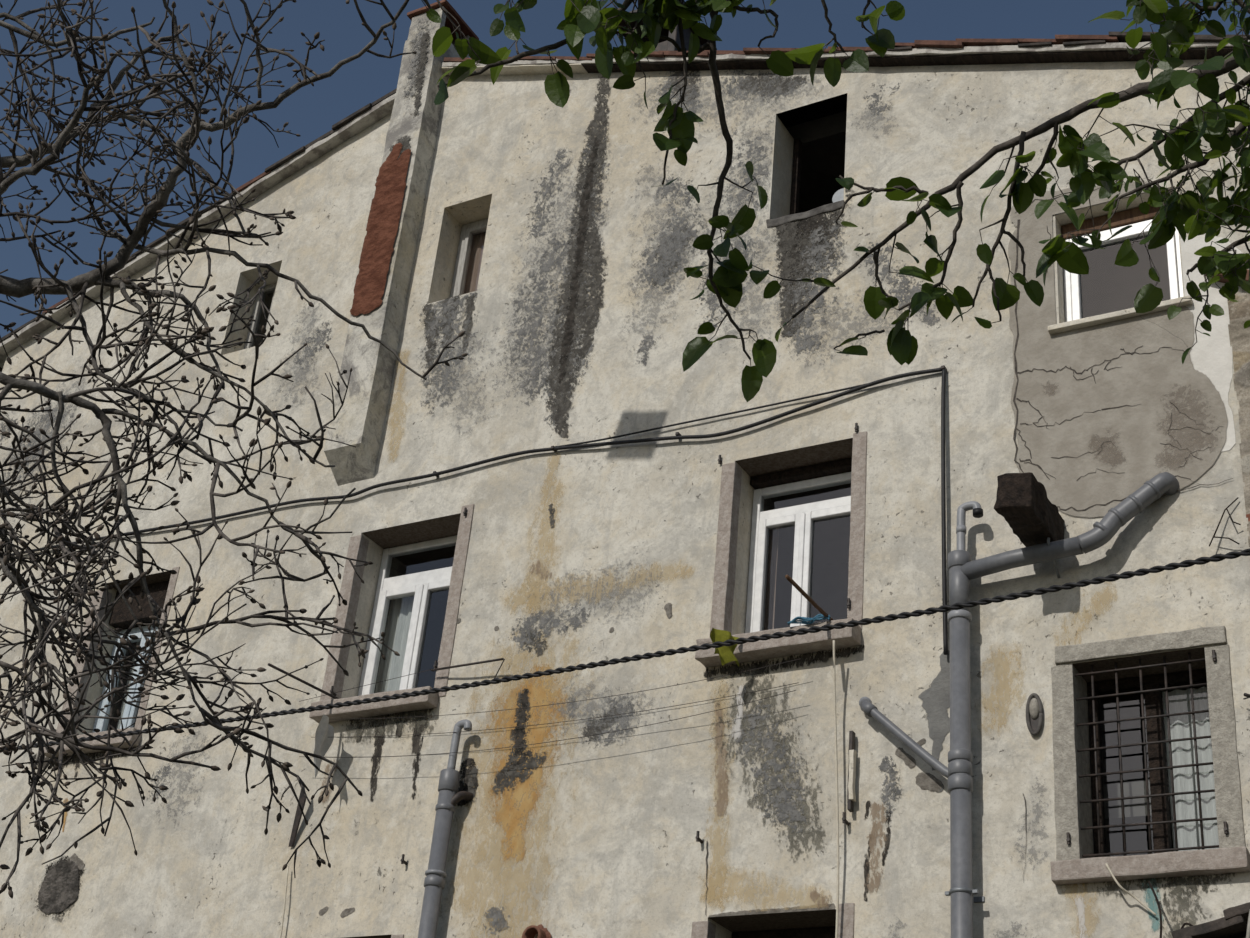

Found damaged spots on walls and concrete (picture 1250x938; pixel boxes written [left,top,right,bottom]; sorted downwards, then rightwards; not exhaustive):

flaking render [350,135,411,316]
water stain [505,76,615,437]
water stain [630,174,942,354]
water stain [418,289,480,413]
water stain [635,335,658,366]
crack [1013,195,1184,511]
crack [1160,402,1233,491]
water stain [508,604,590,657]
water stain [341,708,438,802]
water stain [566,694,640,748]
water stain [703,644,865,861]
flaking render [36,853,85,921]